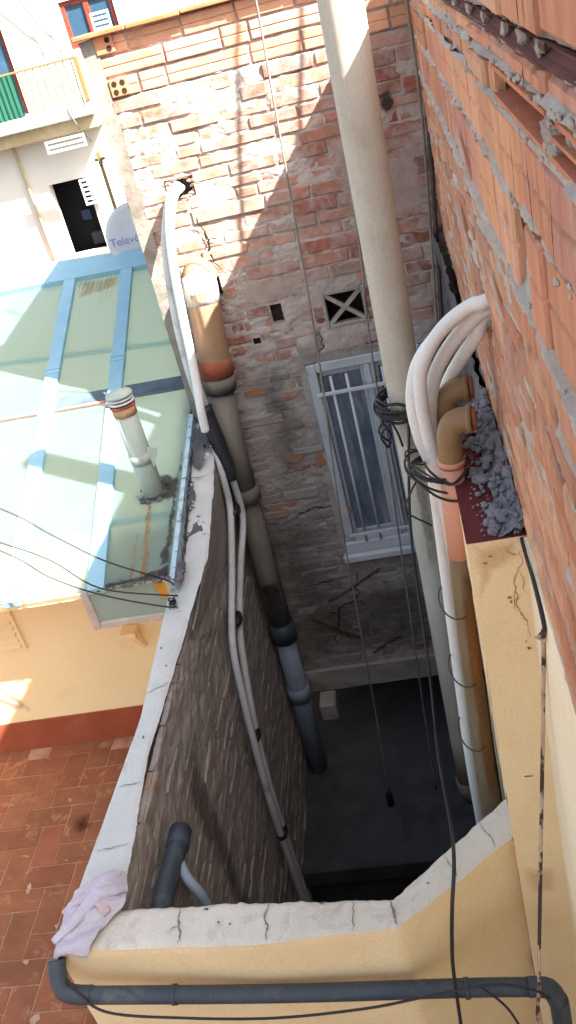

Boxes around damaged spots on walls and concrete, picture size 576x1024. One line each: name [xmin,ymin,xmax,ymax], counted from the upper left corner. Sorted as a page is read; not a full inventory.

crack [196,217,221,270]
rust [131,504,151,577]
crack [308,571,366,646]
crack [506,549,531,636]
crack [170,909,182,943]
crack [262,903,270,940]